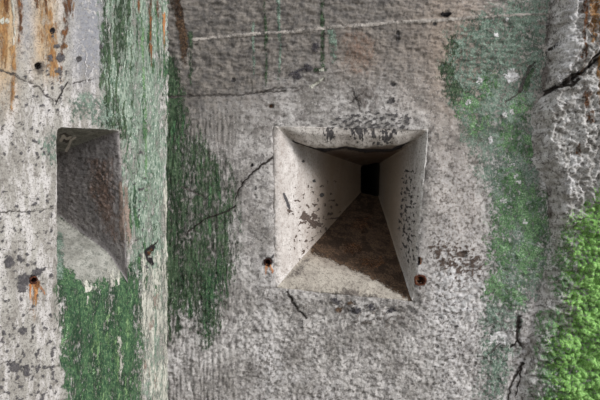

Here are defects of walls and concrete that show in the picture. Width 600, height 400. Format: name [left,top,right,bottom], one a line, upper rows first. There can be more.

corrosion [0,0,23,109]
crack [0,54,94,113]
corrosion [35,0,75,84]
damp [553,0,584,84]
crack [542,52,600,97]
damp [99,0,230,400]
crack [187,157,273,235]
damp [432,3,552,399]
corrosion [29,281,45,306]
damp [57,233,133,400]
crack [286,291,308,319]
crack [483,315,526,400]